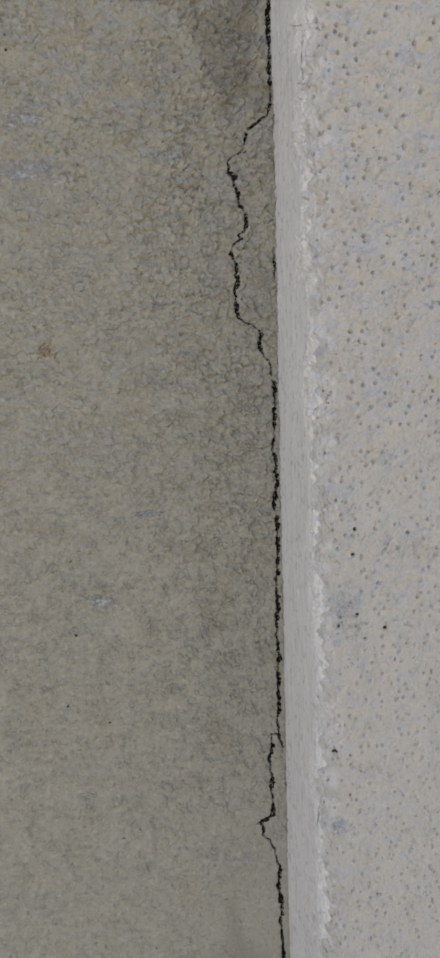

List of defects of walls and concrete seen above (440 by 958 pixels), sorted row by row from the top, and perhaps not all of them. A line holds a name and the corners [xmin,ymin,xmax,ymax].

crack [226,0,305,958]